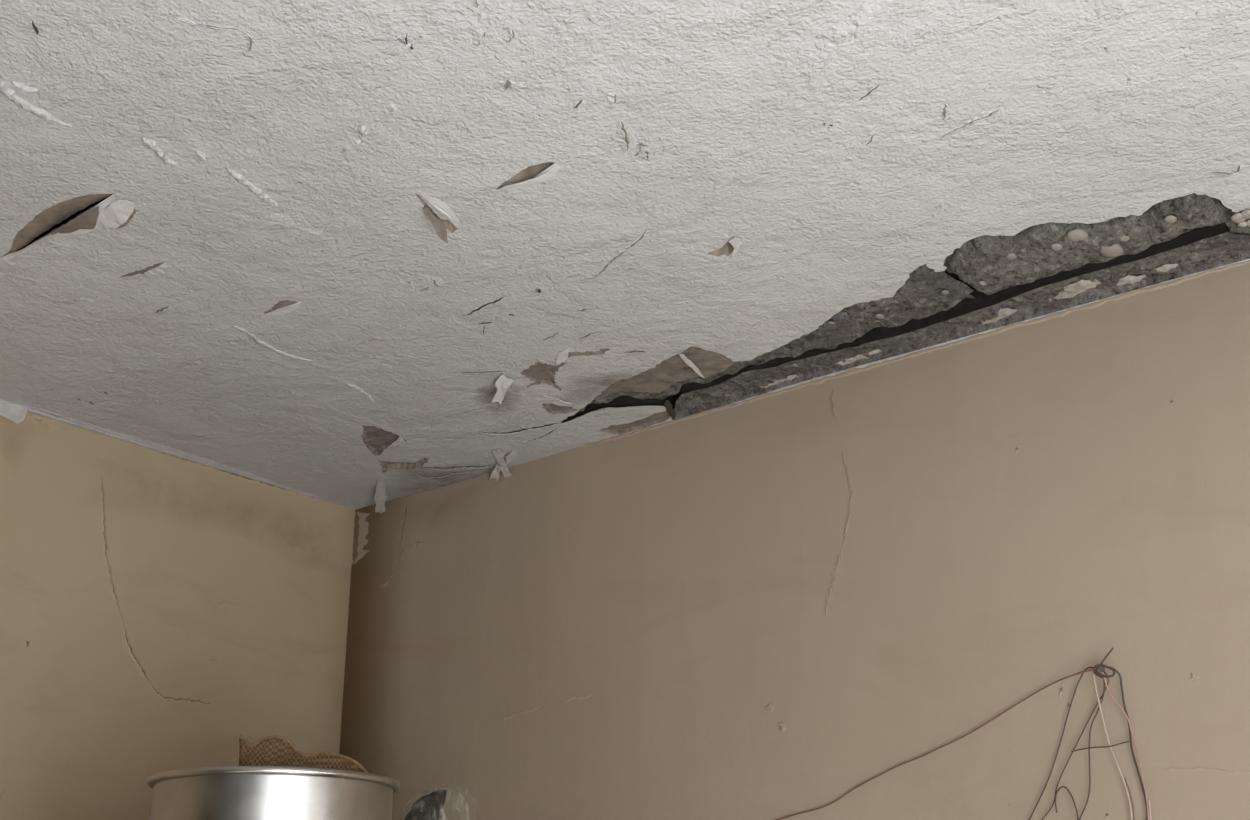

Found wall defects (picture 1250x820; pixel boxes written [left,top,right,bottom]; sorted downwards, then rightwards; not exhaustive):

peeling [0,194,137,261]
peeling [415,193,461,244]
peeling [496,162,561,191]
spalling [492,193,1250,459]
peeling [361,425,429,514]
crack [100,475,212,705]